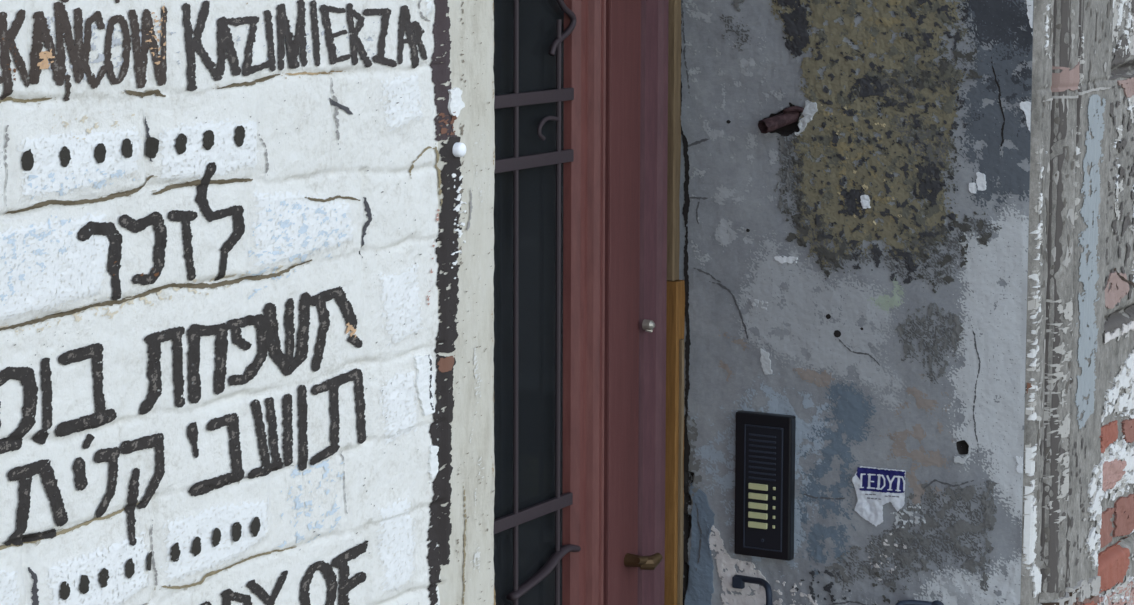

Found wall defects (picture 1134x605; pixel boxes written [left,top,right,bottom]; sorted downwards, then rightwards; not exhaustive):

crack [923,325,981,489]
peeling [1026,151,1047,421]
peeling [1104,321,1134,344]
peeling [1016,444,1042,598]